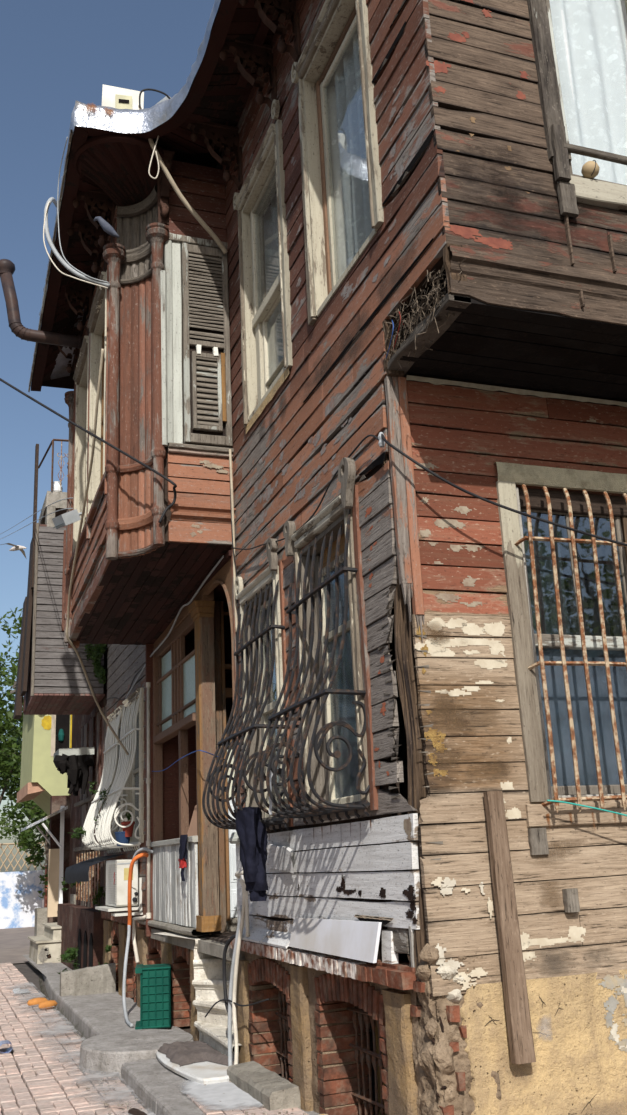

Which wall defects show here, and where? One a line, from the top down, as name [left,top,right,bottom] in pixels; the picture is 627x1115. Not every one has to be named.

peeling [420,506,484,564]
peeling [415,576,507,696]
spalling [431,877,493,919]
peeling [520,926,586,962]
spalling [410,943,488,1115]
peeling [598,974,627,1052]